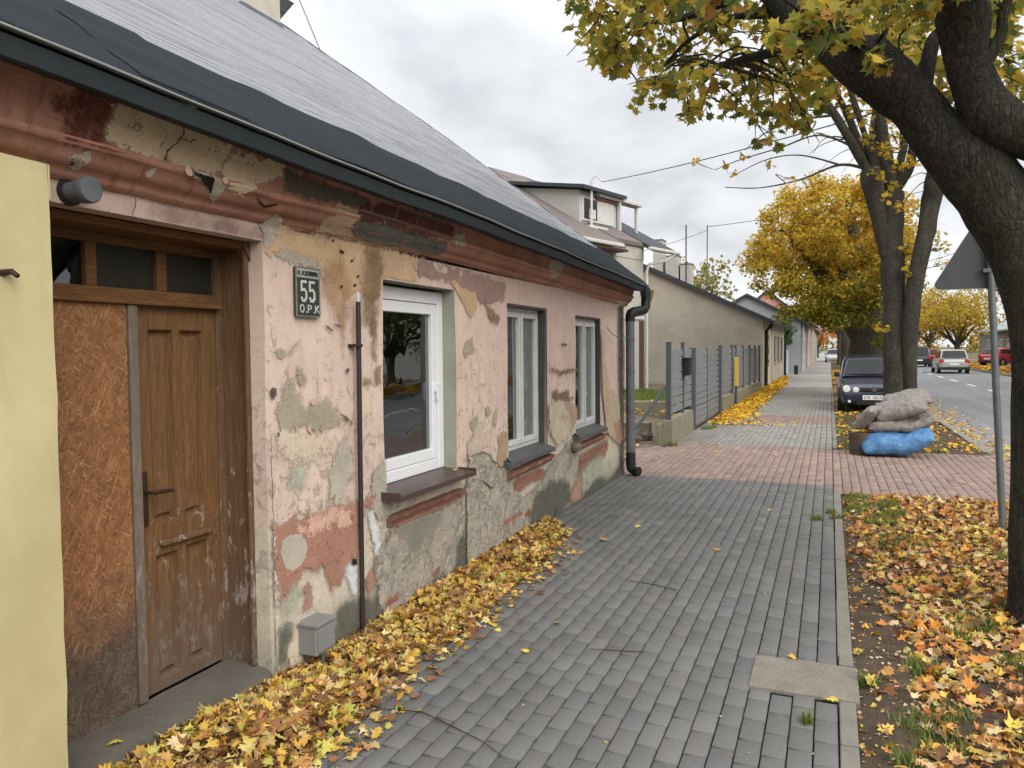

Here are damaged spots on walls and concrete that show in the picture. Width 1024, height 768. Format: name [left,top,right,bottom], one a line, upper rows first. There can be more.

damp [52,88,118,155]
crack [164,126,195,161]
flaking render [105,103,478,319]
peeling [270,347,342,470]
peeling [296,505,357,538]
flaking render [370,328,624,611]